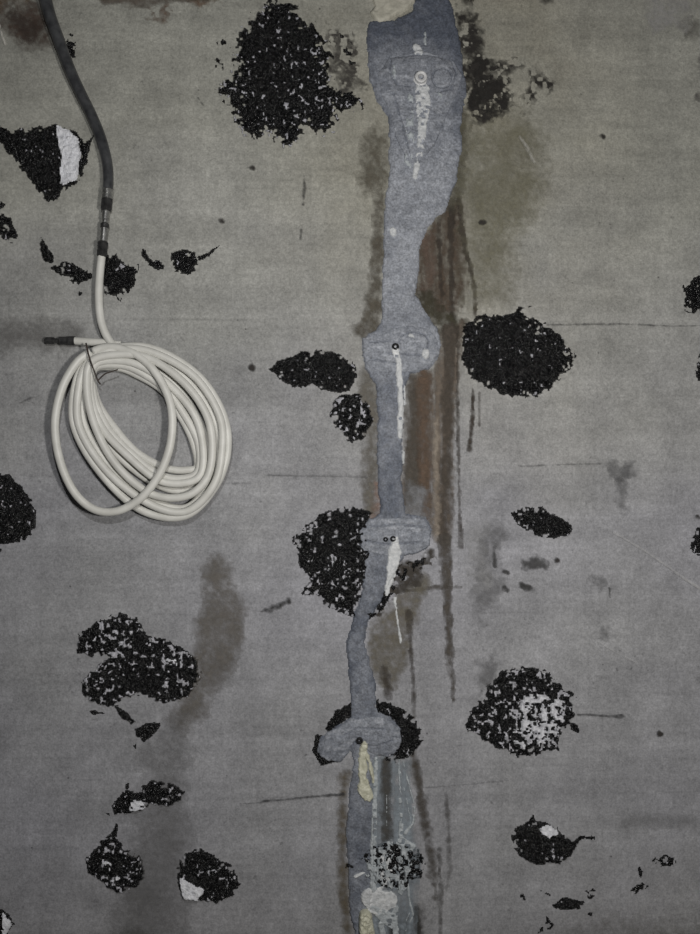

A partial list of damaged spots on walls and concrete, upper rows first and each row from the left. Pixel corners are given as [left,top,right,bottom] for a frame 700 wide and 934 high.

corrosion [402,196,477,542]